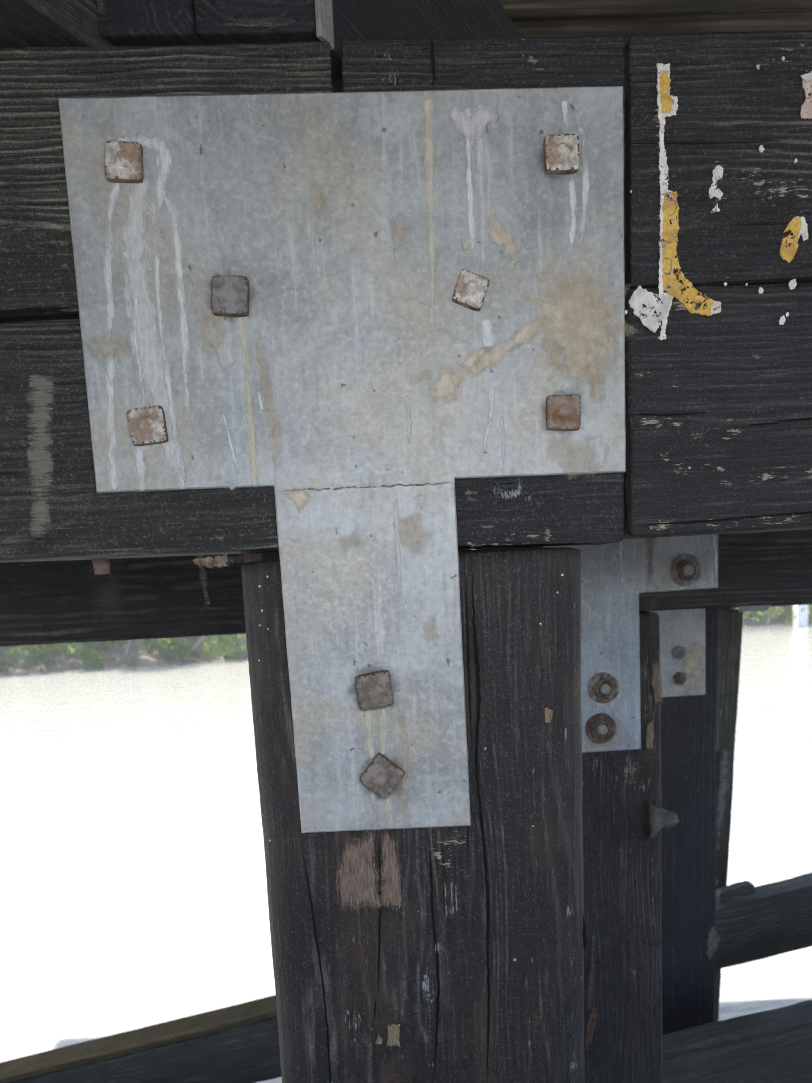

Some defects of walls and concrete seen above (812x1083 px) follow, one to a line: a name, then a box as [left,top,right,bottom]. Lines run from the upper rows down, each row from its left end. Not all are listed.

peeling [756,43,812,119]
damp [451,108,494,262]
peeling [625,63,721,340]
damp [104,136,190,490]
peeling [639,416,746,440]
peeling [749,467,812,488]
crack [300,837,331,1083]
crack [373,847,381,1016]